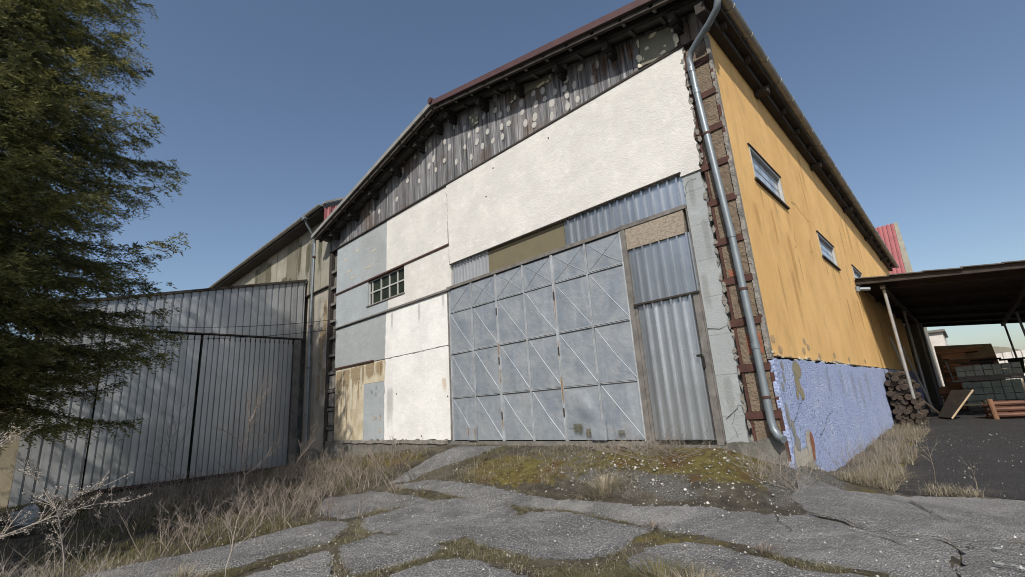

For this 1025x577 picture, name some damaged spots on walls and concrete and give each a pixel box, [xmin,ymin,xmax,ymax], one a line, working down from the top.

peeling [636,28,704,165]
leakage [335,361,383,424]
flaking render [770,335,877,469]
crack [764,500,1017,550]